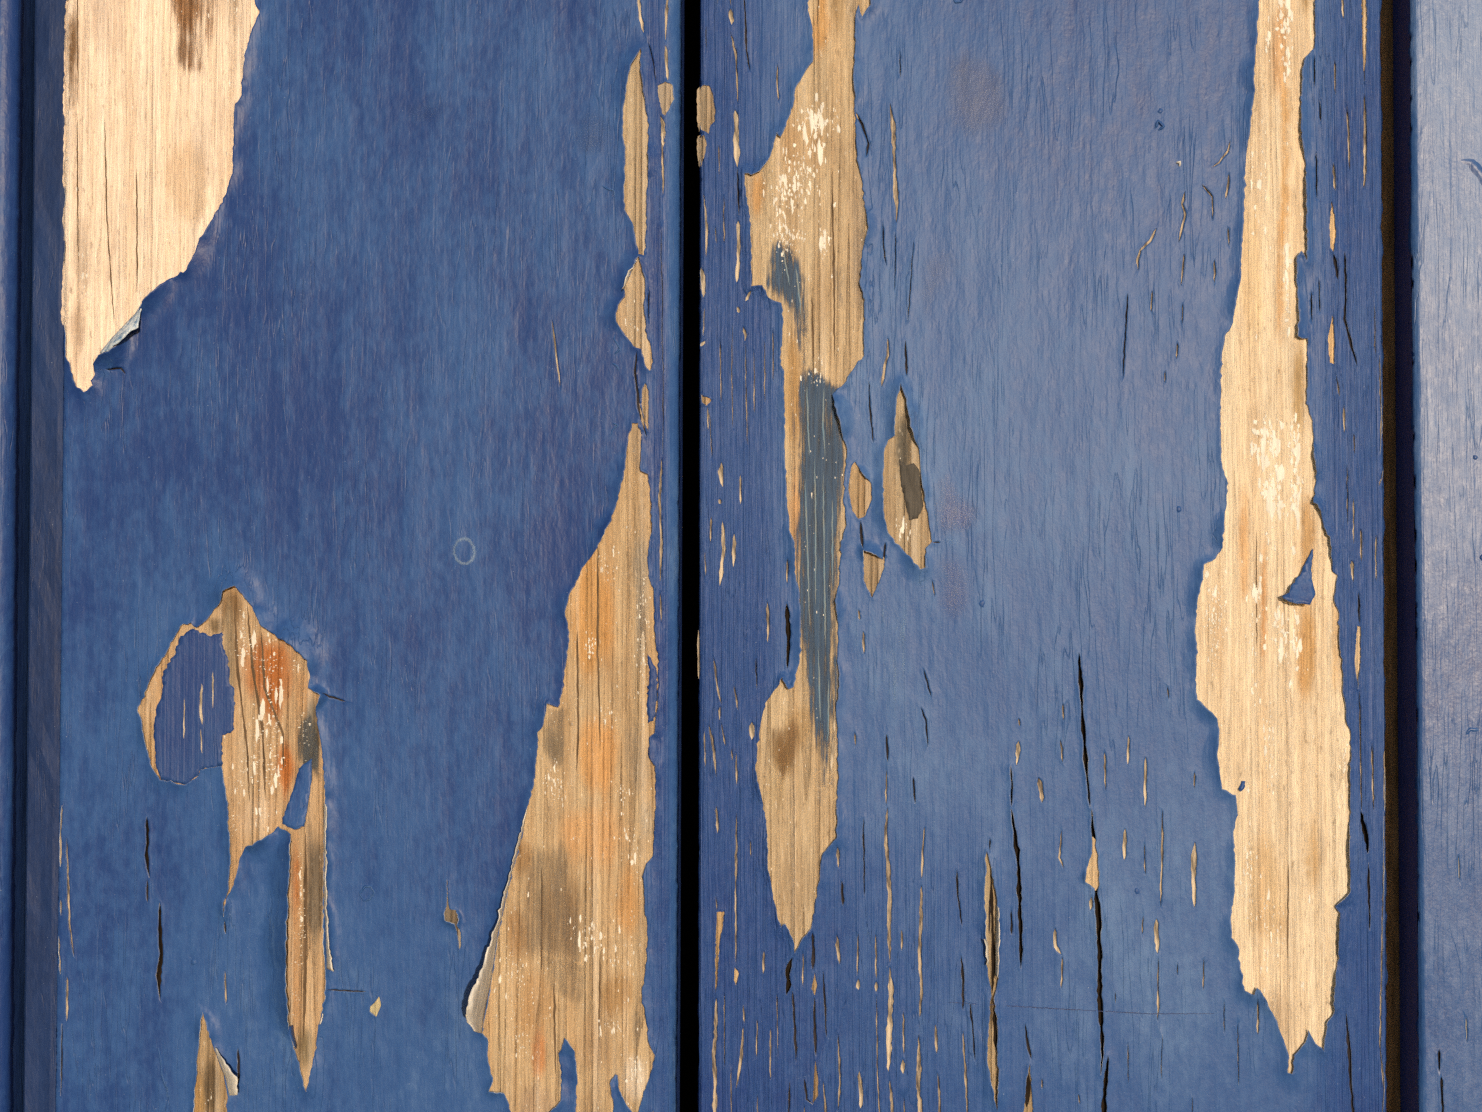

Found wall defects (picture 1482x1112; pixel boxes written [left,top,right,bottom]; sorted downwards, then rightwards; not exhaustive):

peeling [61,0,260,392]
leakage [174,0,209,69]
peeling [465,48,674,1112]
crack [699,0,779,584]
peeling [745,0,932,952]
crack [858,60,914,440]
peeling [1195,0,1361,1074]
peeling [194,1015,238,1112]
peeling [138,586,334,1090]
crack [697,560,975,1112]
crack [989,655,1259,1112]
crack [1438,1021,1467,1112]